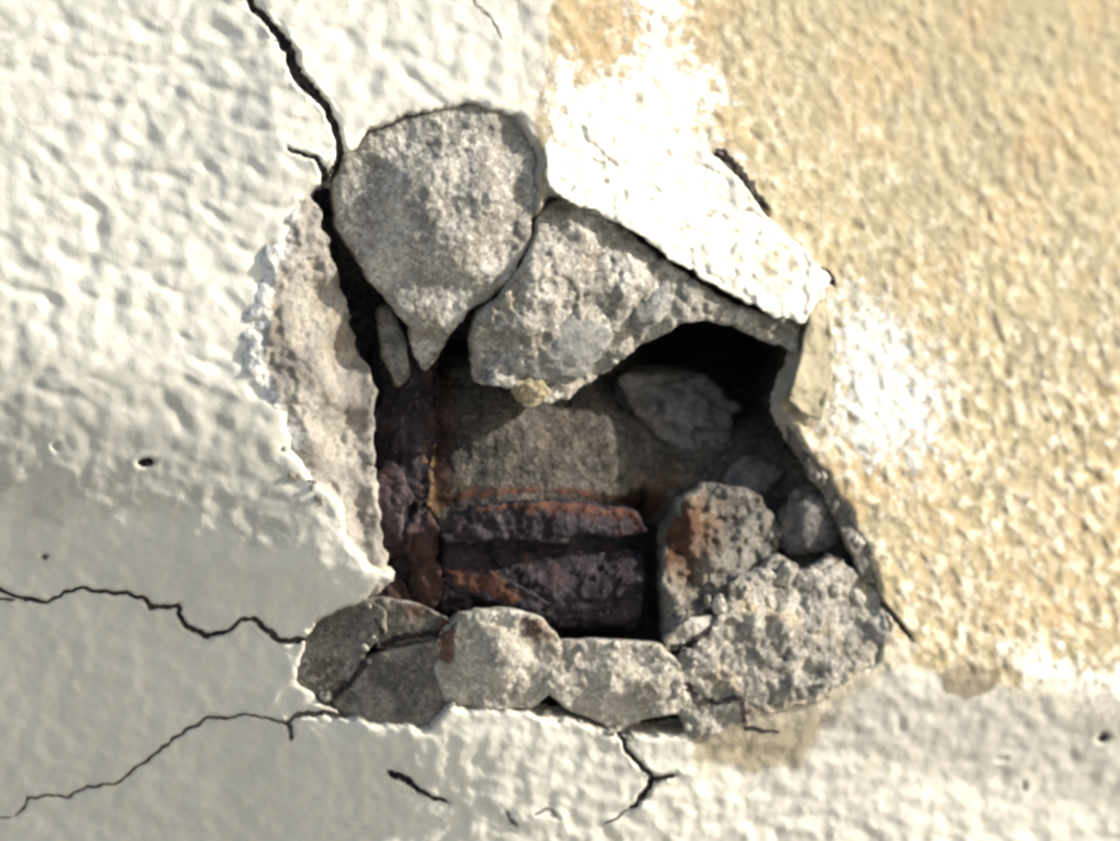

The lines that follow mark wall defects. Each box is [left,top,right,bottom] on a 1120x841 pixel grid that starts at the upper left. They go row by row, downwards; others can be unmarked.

crack [474,0,503,40]
crack [246,0,344,183]
spalling [240,0,920,755]
corrosion [390,353,667,663]
corrosion [664,498,714,581]
crack [0,586,306,644]
crack [0,619,447,819]
crack [505,807,557,827]
crack [604,732,675,824]